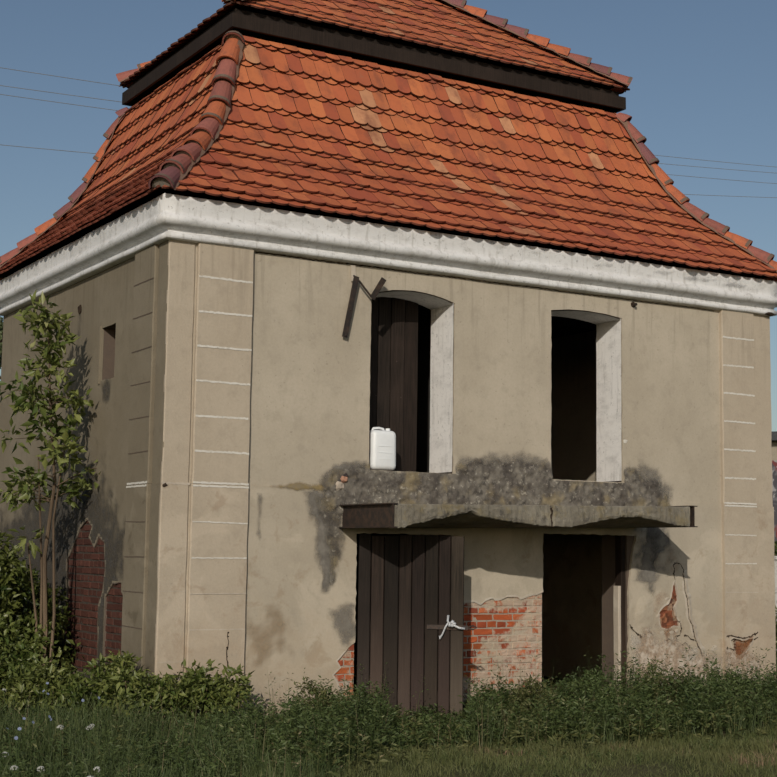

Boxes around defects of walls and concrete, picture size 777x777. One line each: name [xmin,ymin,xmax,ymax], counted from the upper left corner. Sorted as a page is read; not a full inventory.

damp [279,456,670,592]
flaking render [64,519,123,672]
flaking render [332,644,354,701]
peeling [463,590,543,712]
crack [673,562,708,657]
peeling [632,580,759,689]
crack [727,632,758,651]